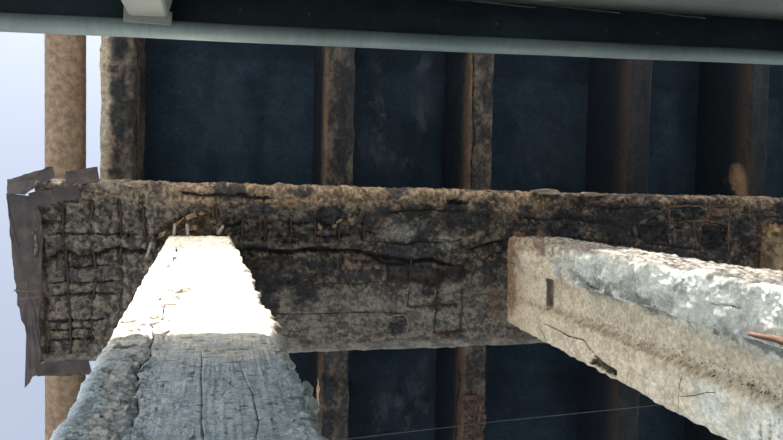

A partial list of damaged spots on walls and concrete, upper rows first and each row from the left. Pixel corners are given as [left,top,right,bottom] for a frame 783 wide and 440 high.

damp [107,42,126,175]
damp [383,201,422,241]
spalling [632,199,733,252]
spalling [761,206,783,234]
crack [132,306,165,427]
crack [198,353,206,440]
spalling [35,181,466,440]
damp [242,256,339,317]
damp [388,318,405,334]
crack [538,322,594,353]